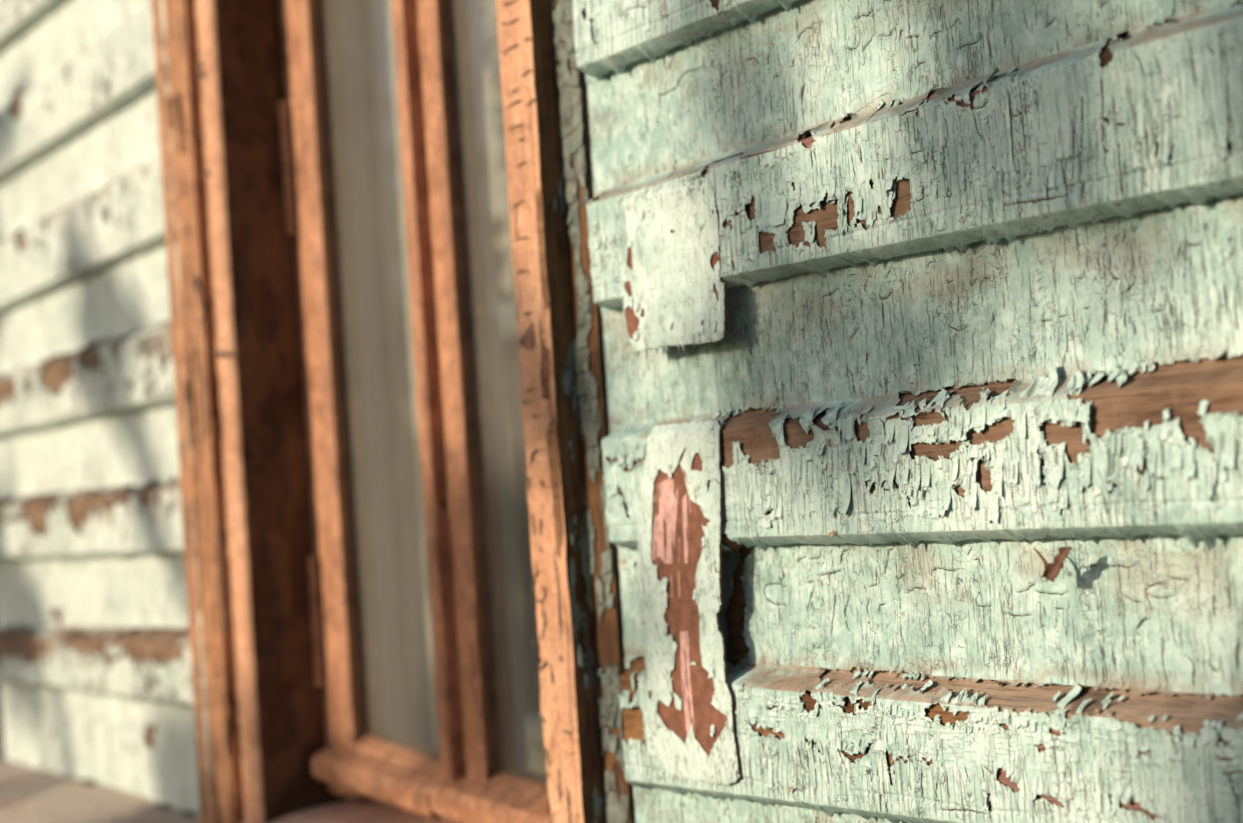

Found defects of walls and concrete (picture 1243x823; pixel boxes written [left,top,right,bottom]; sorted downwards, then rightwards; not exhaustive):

crack [847,0,982,68]
peeling [712,169,912,260]
crack [668,75,1201,357]
peeling [519,0,756,823]
peeling [711,354,1243,523]
peeling [0,607,189,692]
crack [761,547,982,633]
crack [975,583,1066,617]
crack [1084,564,1240,684]
peeling [799,666,1243,786]
crack [909,764,992,814]
peeling [982,767,1064,811]